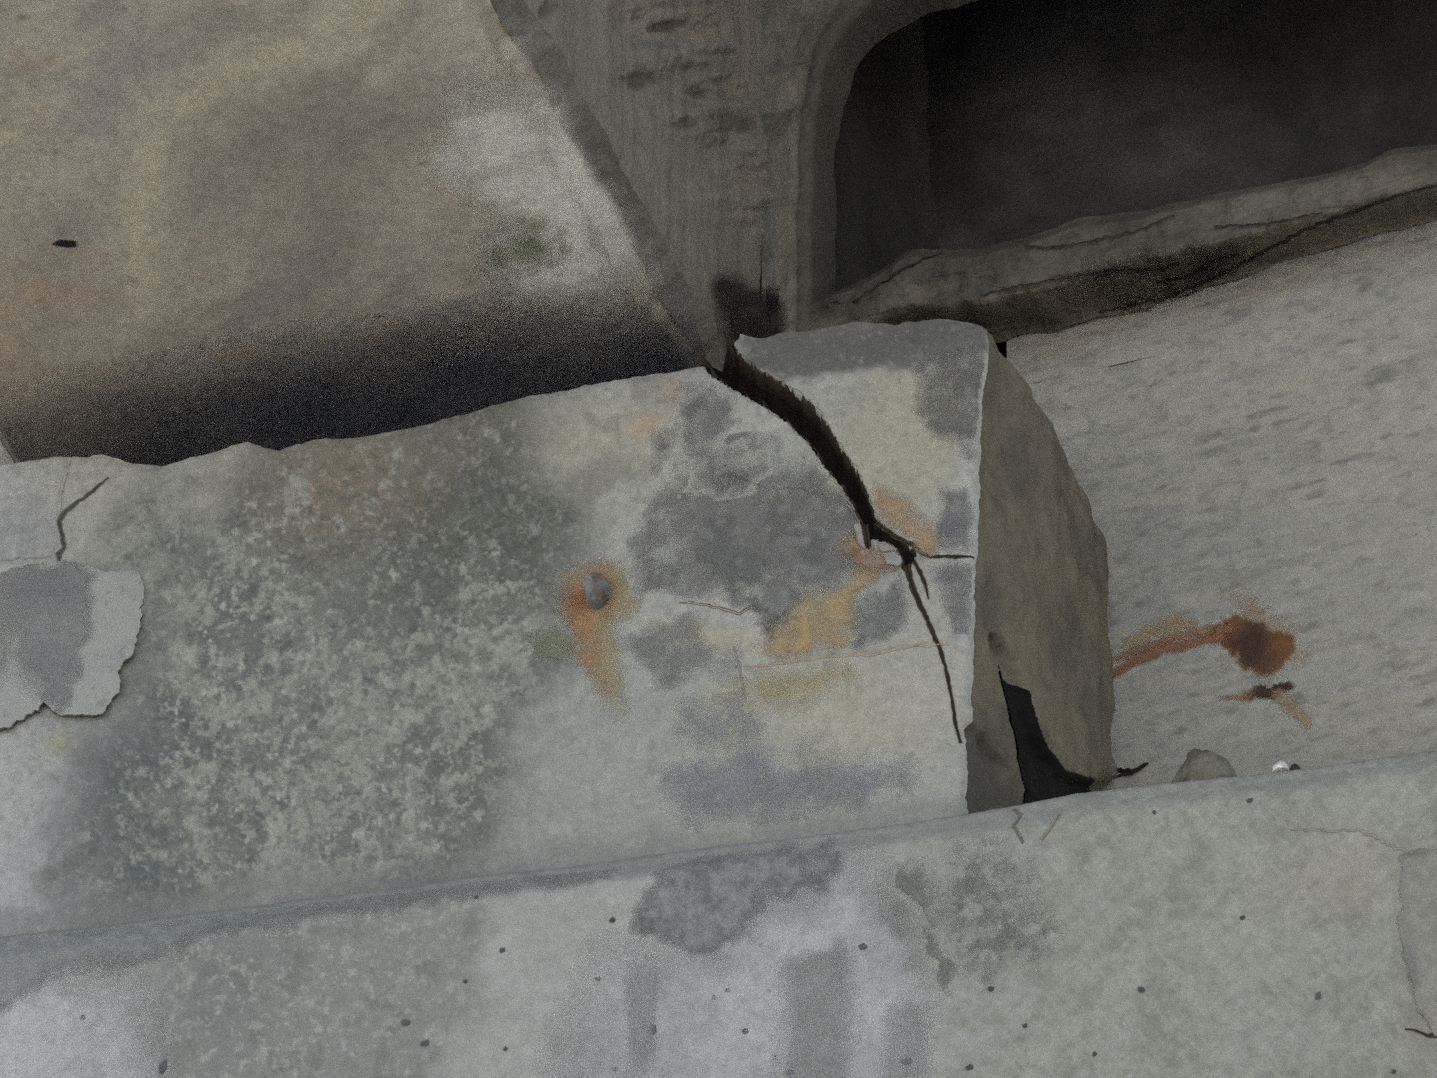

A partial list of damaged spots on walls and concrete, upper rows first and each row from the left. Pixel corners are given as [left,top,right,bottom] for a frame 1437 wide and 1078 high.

crack [853,251,943,302]
water stain [682,395,746,445]
water stain [920,355,983,439]
water stain [640,473,860,633]
crack [679,332,974,743]
water stain [938,491,970,545]
flaking render [0,560,144,732]
rust [567,568,632,689]
rust [1113,609,1310,727]
water stain [573,844,932,1078]
water stain [926,935,953,987]
crack [1405,1028,1437,1038]